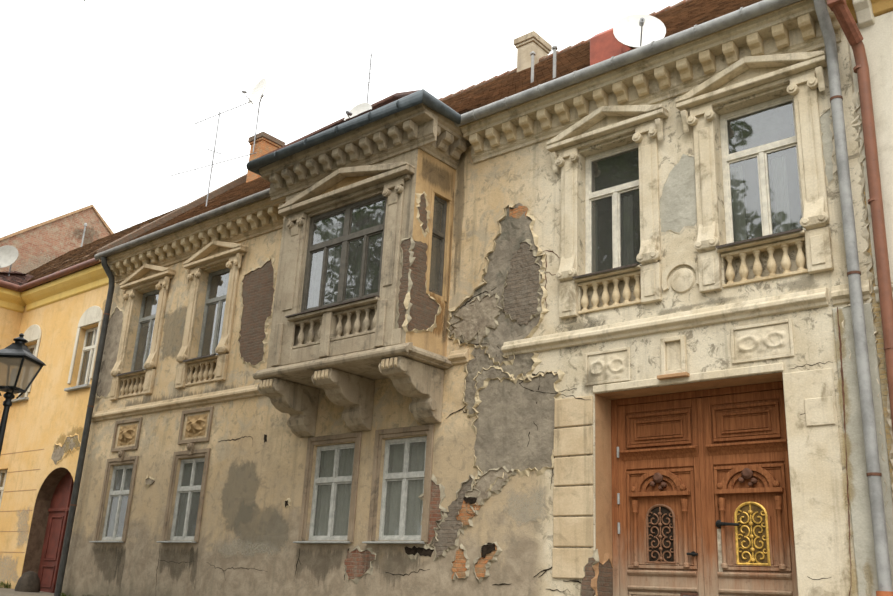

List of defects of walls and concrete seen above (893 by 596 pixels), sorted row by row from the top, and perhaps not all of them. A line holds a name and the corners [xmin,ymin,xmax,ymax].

crack [543,250,559,308]
flaking render [238,257,277,369]
flaking render [395,192,565,584]
crack [519,371,589,447]
flaking render [51,432,81,465]
flaking render [344,546,377,584]
crack [534,567,581,592]
flaking render [580,549,613,596]